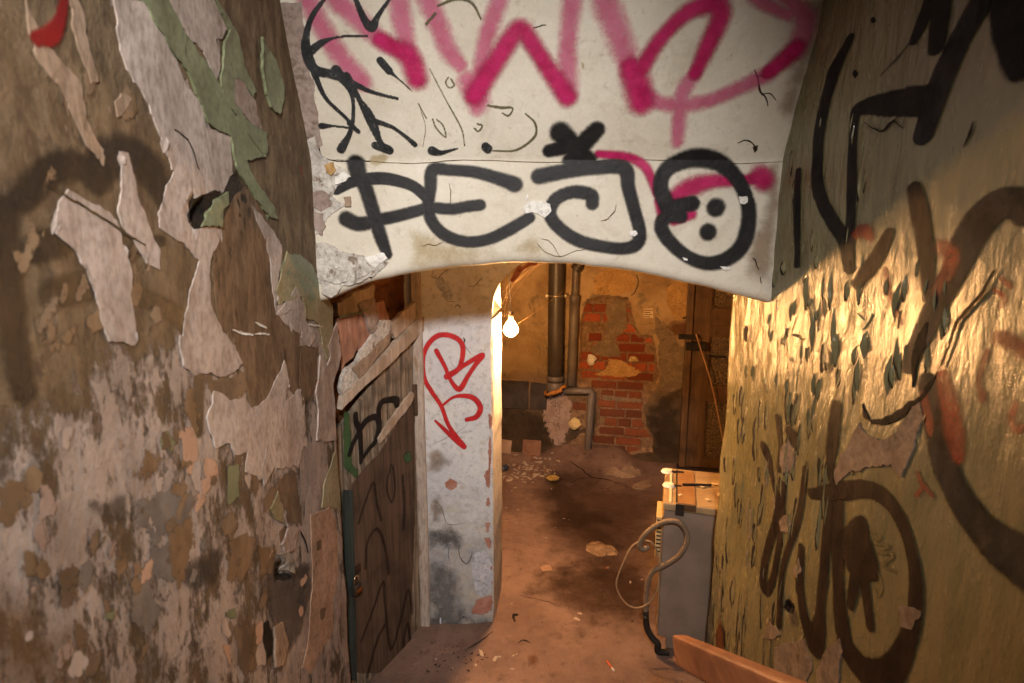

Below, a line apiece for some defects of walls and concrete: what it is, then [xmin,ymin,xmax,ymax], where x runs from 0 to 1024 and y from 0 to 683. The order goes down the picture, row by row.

peeling [0,0,389,679]
flaking render [570,295,660,455]
flaking render [712,227,947,683]
water stain [430,531,460,546]
water stain [429,568,462,625]